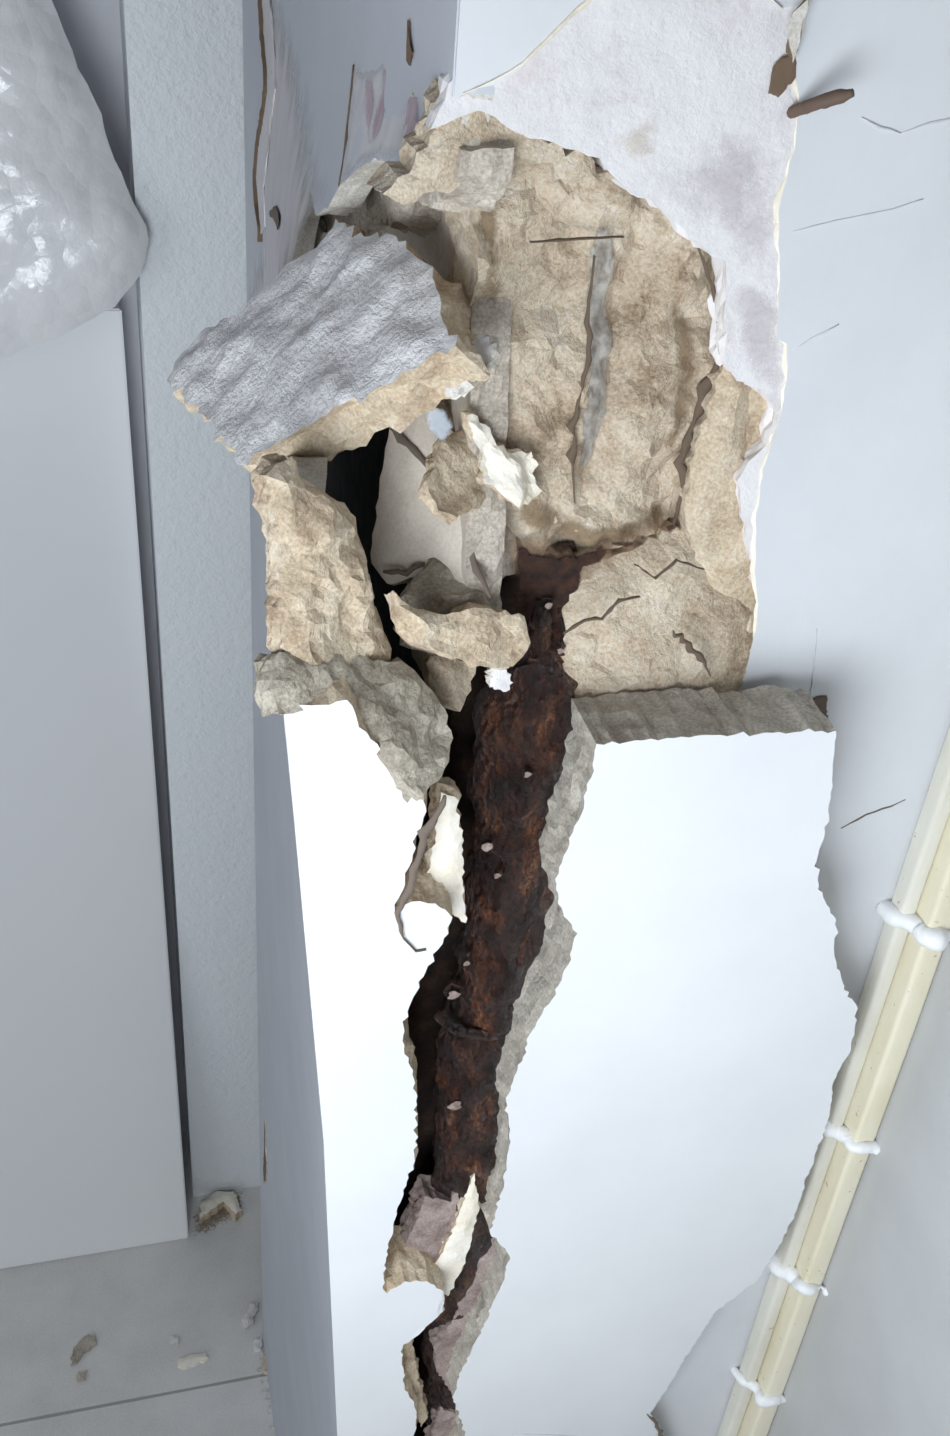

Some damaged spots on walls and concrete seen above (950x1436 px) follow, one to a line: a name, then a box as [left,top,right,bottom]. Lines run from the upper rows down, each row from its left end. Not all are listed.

crack [394,666,495,1436]
crack [469,537,527,621]
spalling [252,0,808,699]
rust [417,536,644,1425]
peeling [812,695,828,718]